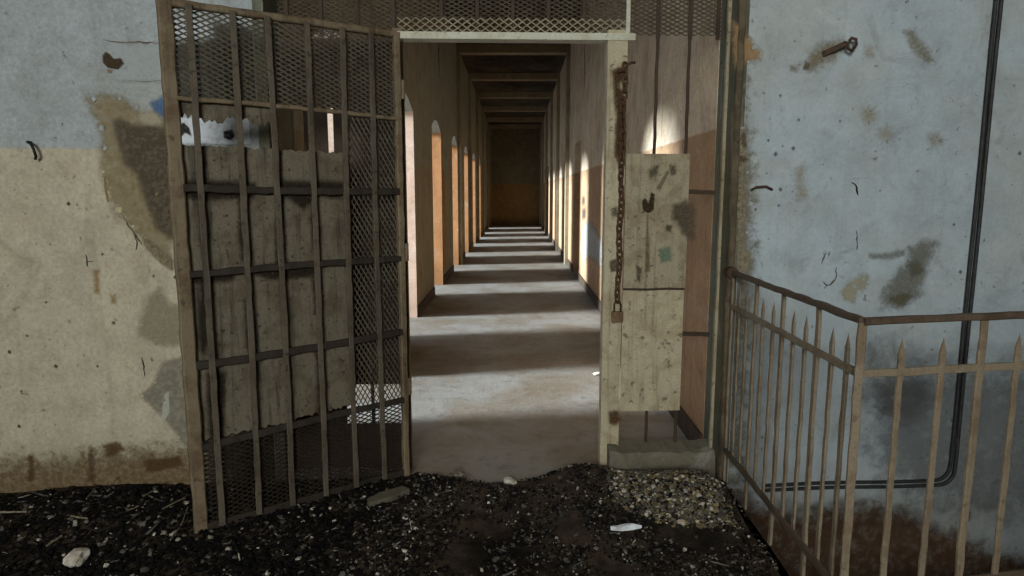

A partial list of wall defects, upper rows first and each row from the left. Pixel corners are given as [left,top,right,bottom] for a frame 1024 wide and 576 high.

spalling [102,52,126,73]
water stain [727,147,1024,576]
water stain [0,443,190,493]